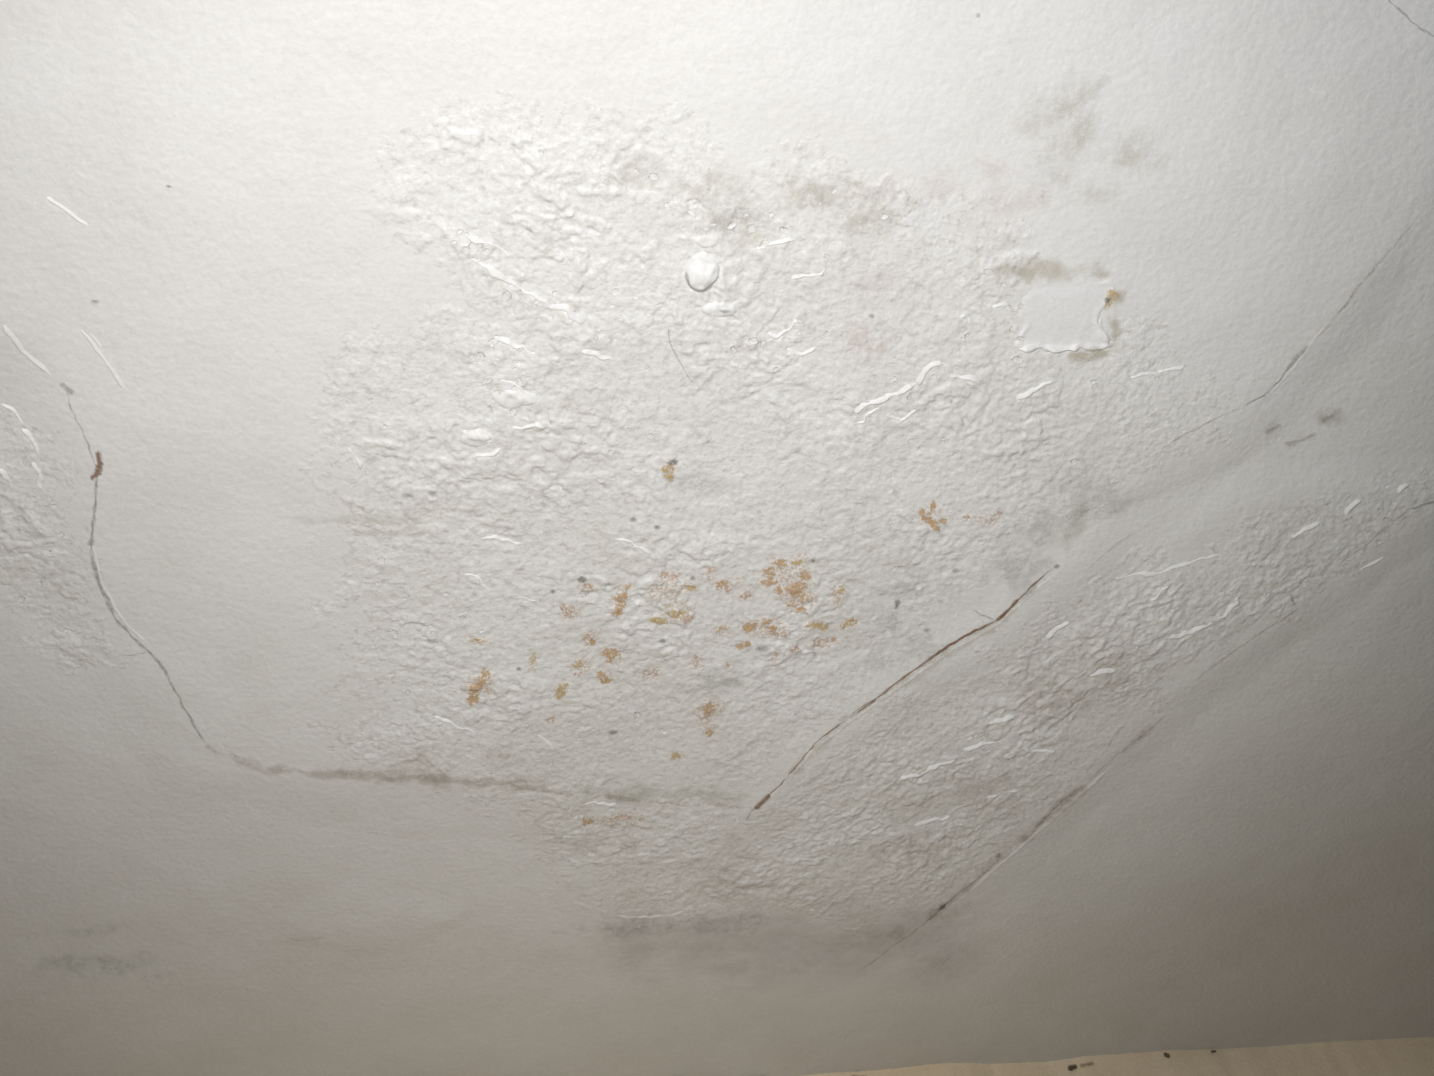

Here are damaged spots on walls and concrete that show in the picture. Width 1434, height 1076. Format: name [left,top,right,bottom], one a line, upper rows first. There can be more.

crack [2,325,52,375]
crack [91,452,103,479]
peeling [297,86,1257,947]
crack [90,544,152,648]
corrosion [611,585,630,615]
corrosion [650,572,696,625]
corrosion [718,560,857,660]
corrosion [467,669,490,705]
corrosion [557,633,617,699]
crack [755,573,1055,809]